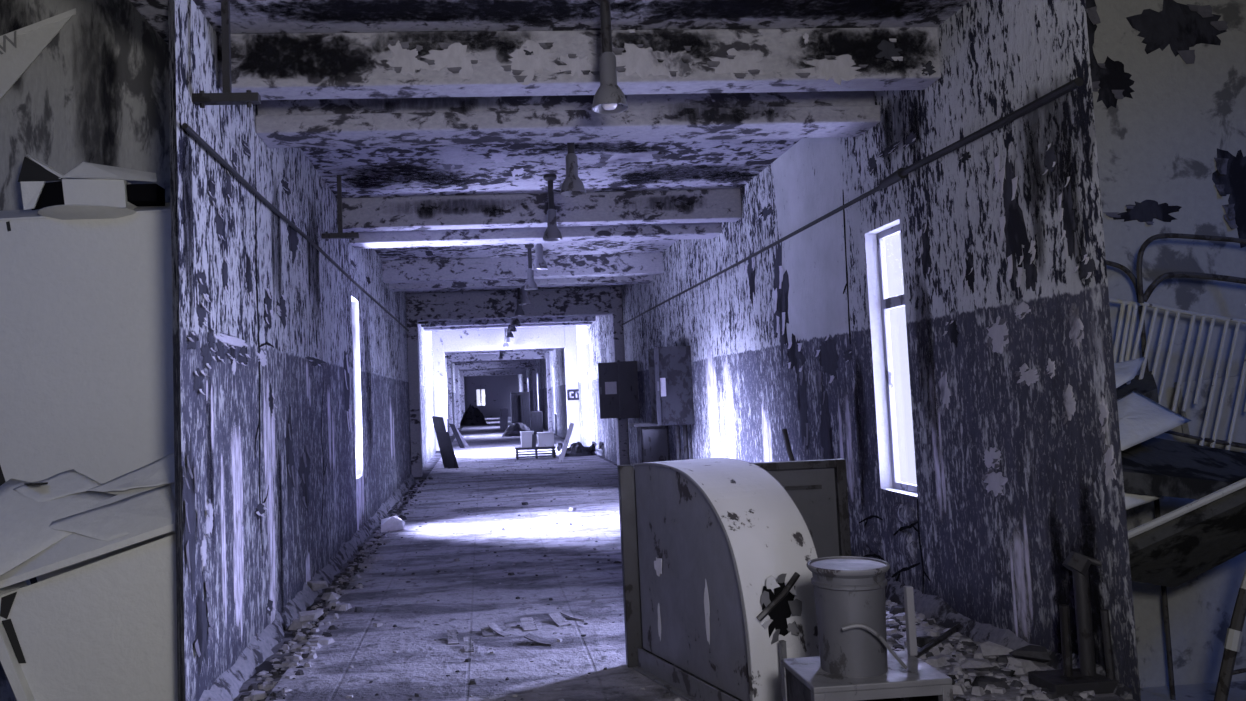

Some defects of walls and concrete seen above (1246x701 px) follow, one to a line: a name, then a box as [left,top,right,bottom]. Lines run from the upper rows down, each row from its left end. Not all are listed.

peeling [386,38,482,80]
peeling [501,37,599,85]
peeling [612,29,693,79]
peeling [795,33,903,85]
peeling [208,140,251,241]
peeling [596,151,665,167]
peeling [186,269,267,395]
peeling [245,253,287,333]
peeling [744,249,756,307]
peeling [773,235,853,459]
peeling [986,154,1038,354]
peeling [182,432,219,676]